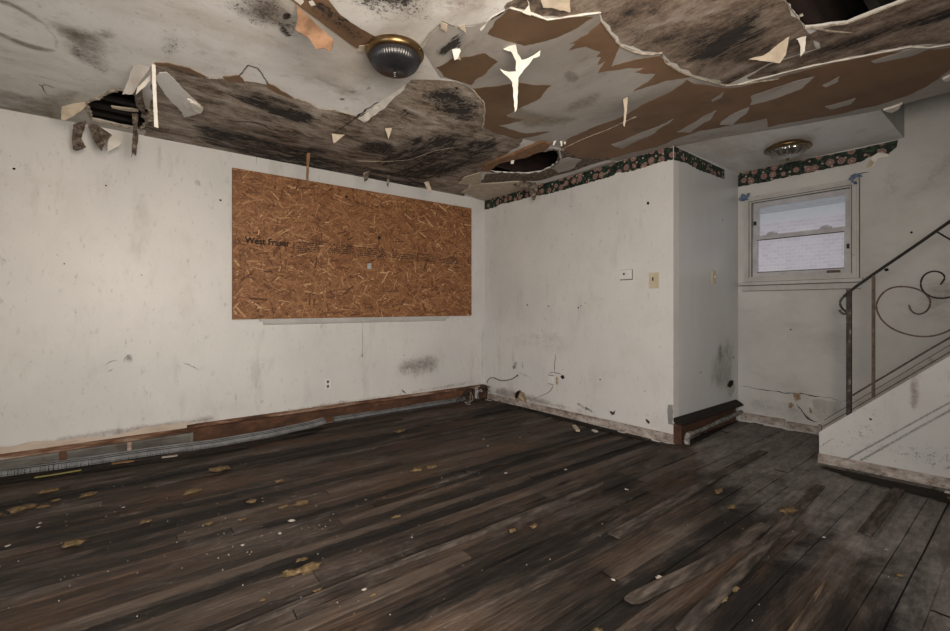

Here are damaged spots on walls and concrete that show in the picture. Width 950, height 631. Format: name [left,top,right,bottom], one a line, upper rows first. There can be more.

mould [229,0,301,36]
peeling [292,0,374,53]
mould [355,0,427,21]
leakage [513,0,950,84]
peeling [423,0,950,172]
leakage [144,66,523,196]